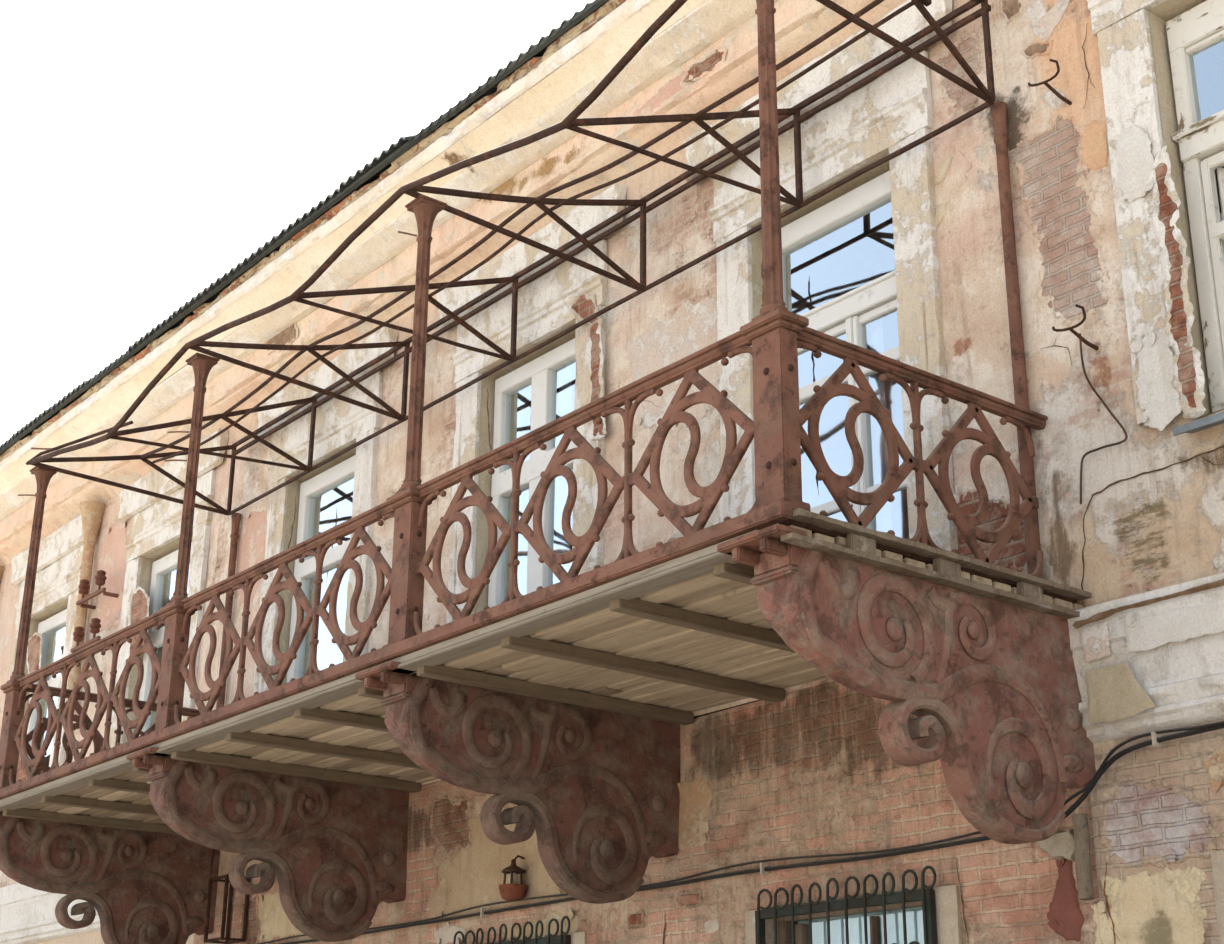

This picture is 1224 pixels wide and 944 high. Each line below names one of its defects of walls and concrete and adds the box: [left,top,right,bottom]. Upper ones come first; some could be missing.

peeling [999,0,1072,59]
flaking render [633,47,727,116]
flaking render [1008,89,1206,431]
flaking render [571,293,604,404]
flaking render [589,416,607,442]
water stain [1114,503,1169,578]
peeling [1072,579,1224,662]
peeling [1098,775,1216,869]